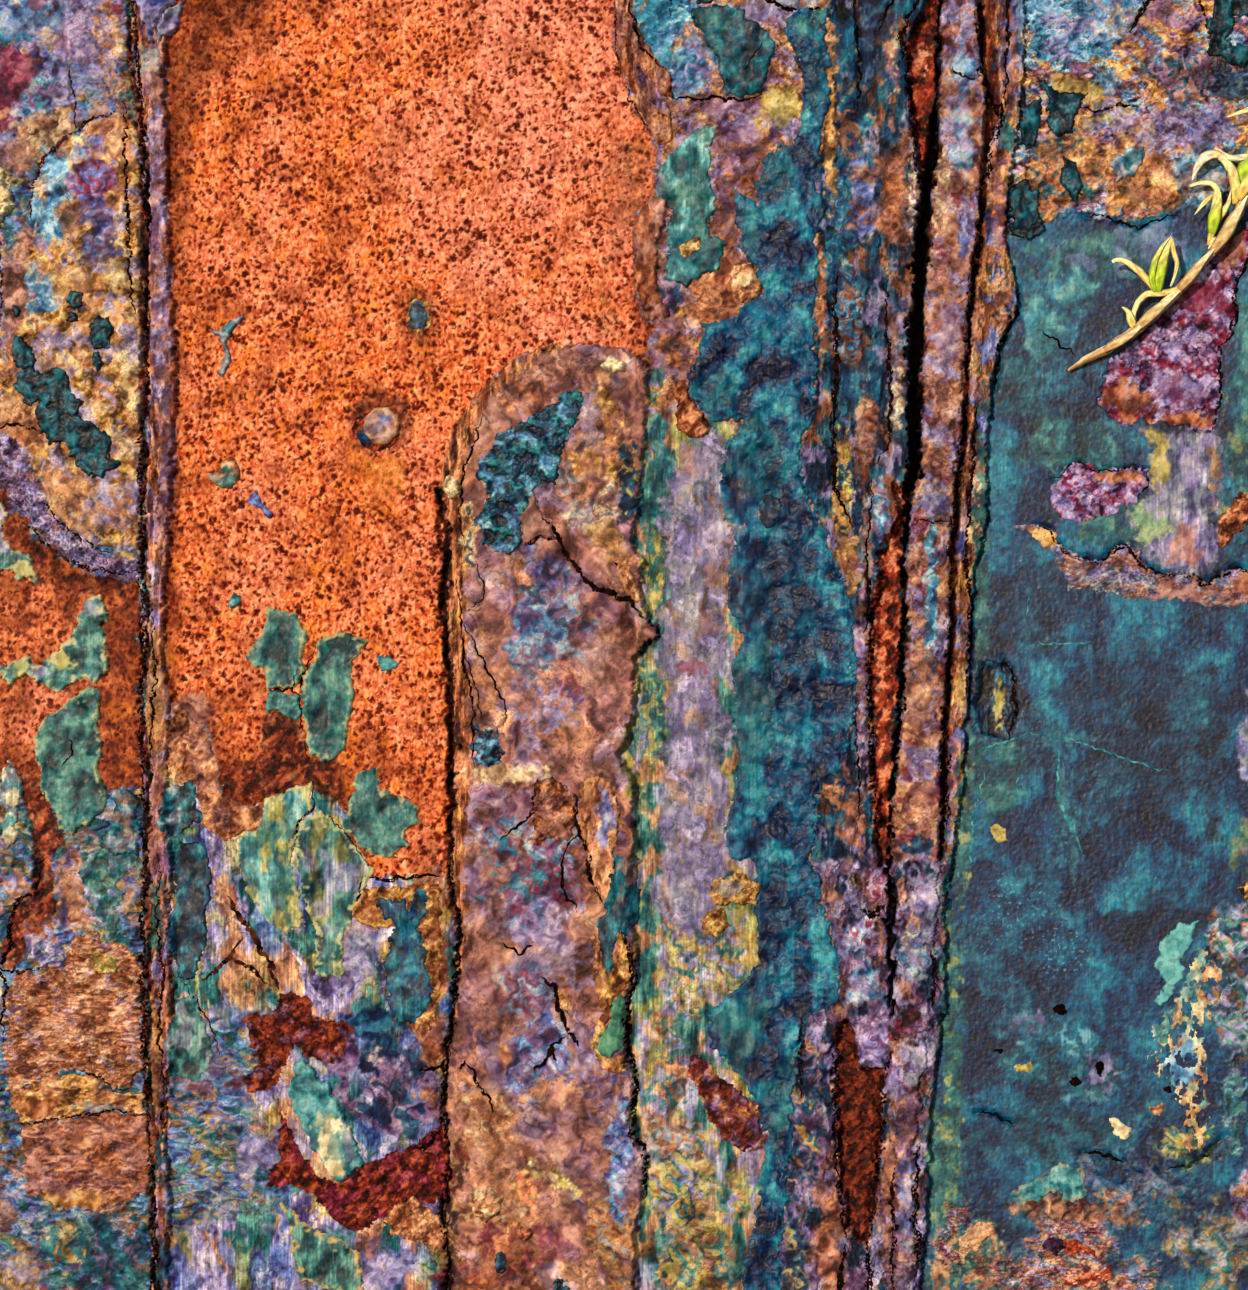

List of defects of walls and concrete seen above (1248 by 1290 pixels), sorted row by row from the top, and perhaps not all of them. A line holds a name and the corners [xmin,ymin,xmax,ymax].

corrosion [613,0,674,145]
peeling [0,502,40,587]
crack [0,0,279,1290]
peeling [245,606,399,763]
crack [455,415,508,770]
crack [525,514,661,657]
corrosion [165,704,345,841]
corrosion [531,776,621,904]
crack [560,793,603,913]
crack [266,647,494,1290]
corrosion [242,991,355,1093]
corrosion [265,1109,451,1252]